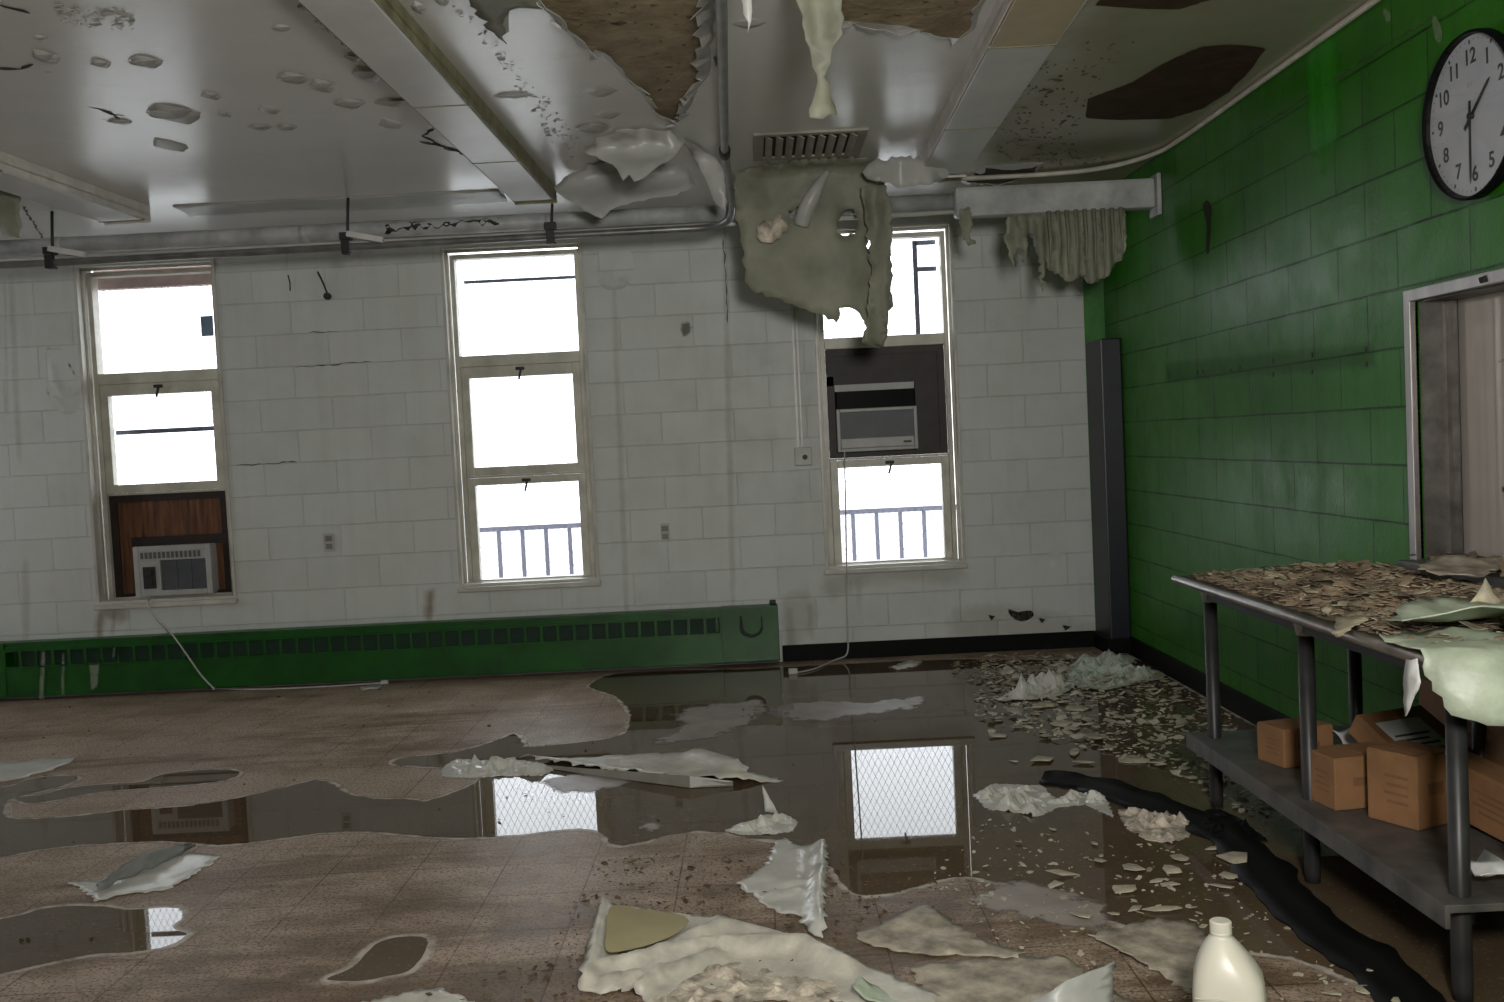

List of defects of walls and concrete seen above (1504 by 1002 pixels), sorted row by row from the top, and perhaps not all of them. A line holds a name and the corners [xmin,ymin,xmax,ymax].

peeling [54,4,136,30]
peeling [841,0,986,46]
peeling [1096,0,1209,9]
peeling [452,0,718,161]
peeling [961,41,1266,186]